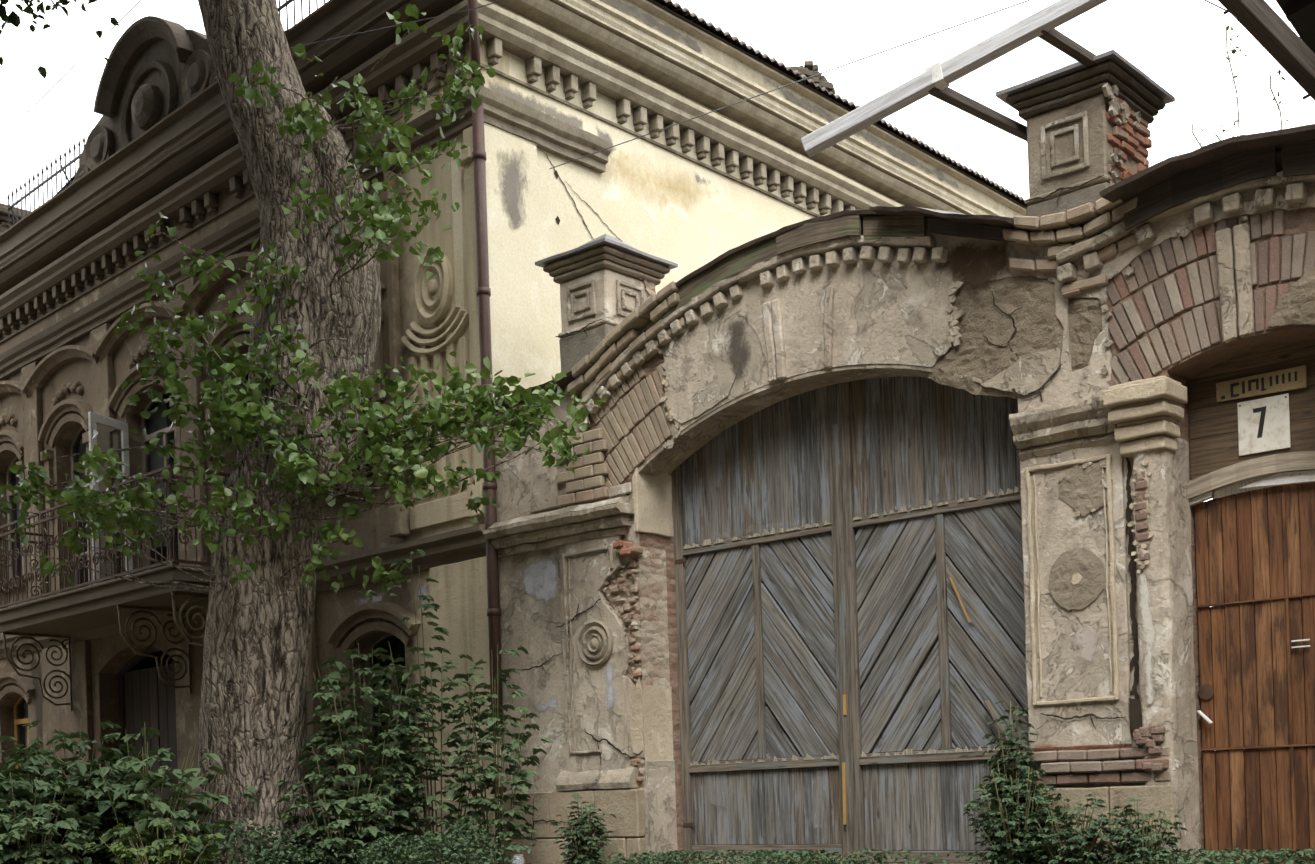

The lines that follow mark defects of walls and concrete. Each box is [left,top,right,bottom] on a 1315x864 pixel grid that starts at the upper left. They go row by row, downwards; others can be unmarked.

flaking render [1102,83,1152,186]
flaking render [928,202,1315,399]
peeling [1127,451,1155,705]